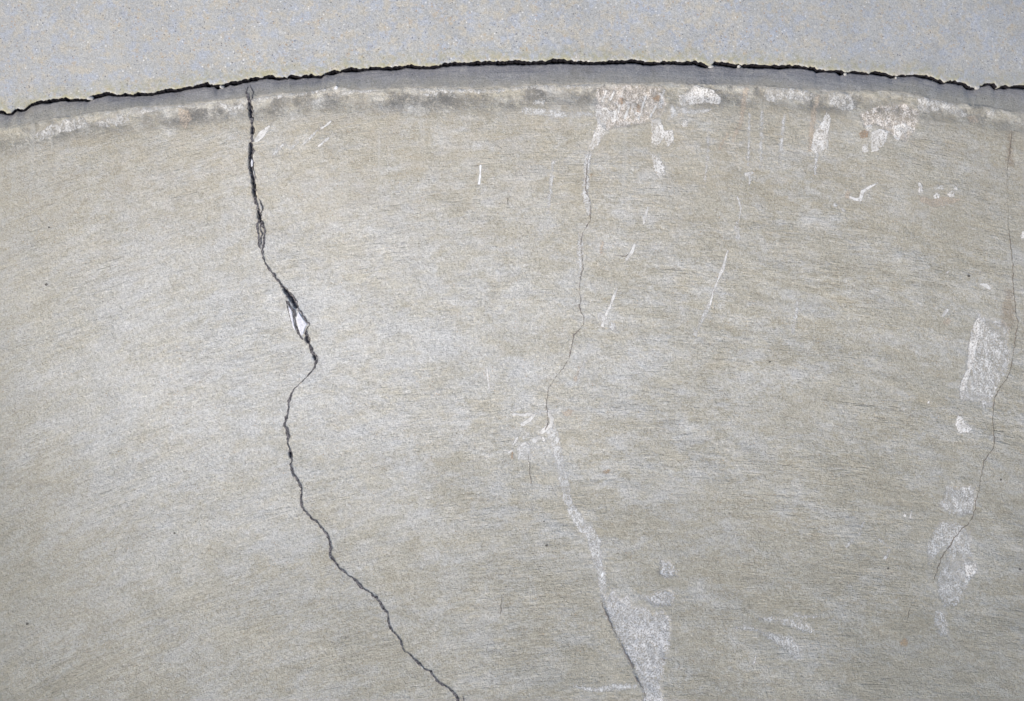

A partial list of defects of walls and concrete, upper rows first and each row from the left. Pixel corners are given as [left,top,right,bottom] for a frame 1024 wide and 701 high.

crack [0,58,975,115]
crack [980,82,1024,90]
crack [245,87,464,701]